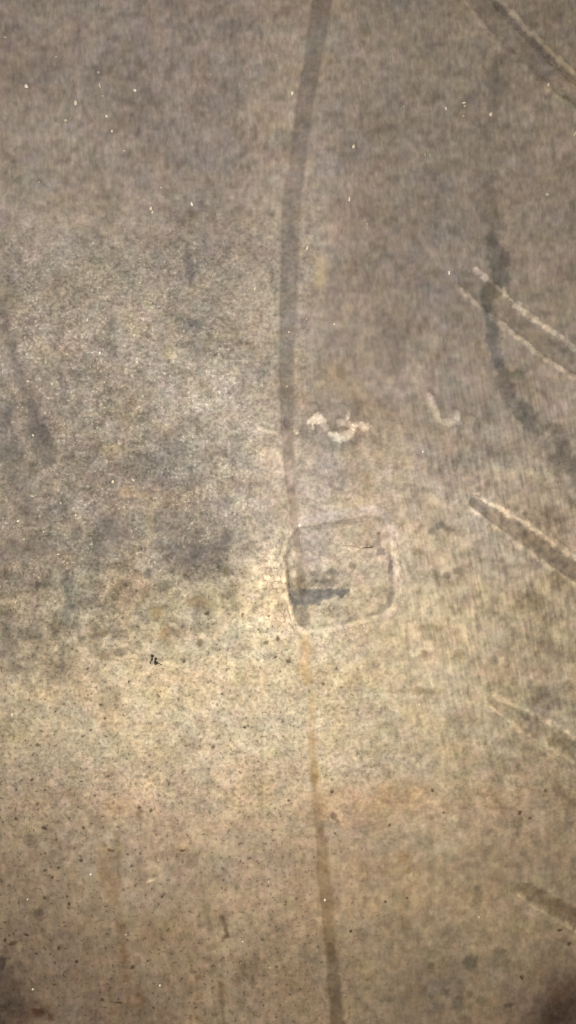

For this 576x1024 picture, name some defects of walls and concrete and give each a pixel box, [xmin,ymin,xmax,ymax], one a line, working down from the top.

damp [475,117,514,298]
damp [480,307,576,494]
damp [285,535,394,629]
damp [385,587,397,608]